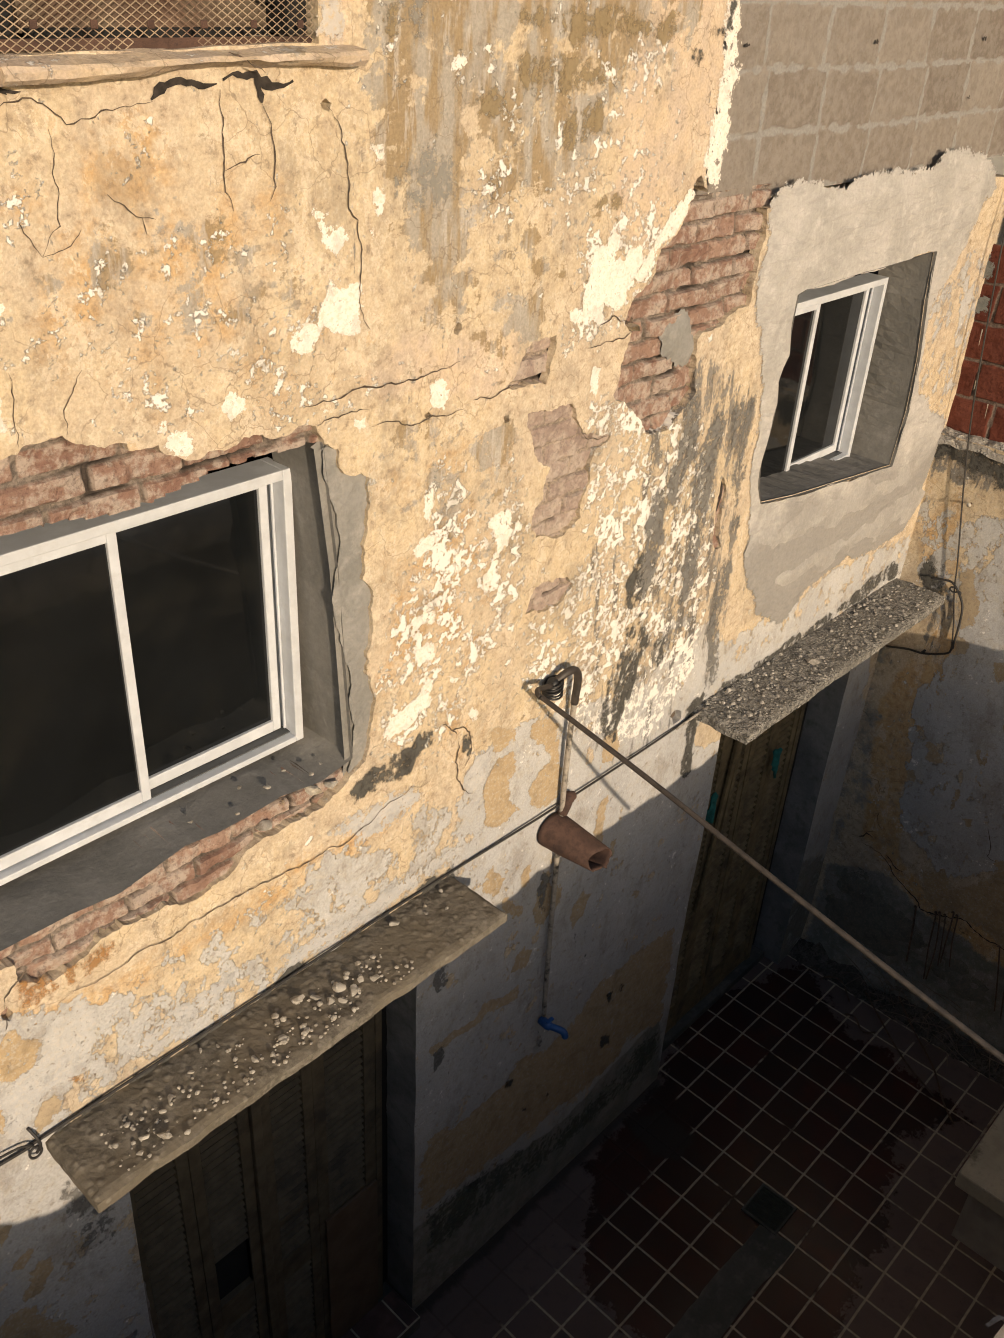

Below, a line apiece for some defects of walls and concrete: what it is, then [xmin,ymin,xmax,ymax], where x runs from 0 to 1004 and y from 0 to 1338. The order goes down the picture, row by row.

crack [0,52,294,257]
crack [329,108,368,326]
spalling [569,0,771,430]
spalling [0,403,332,536]
crack [304,361,518,427]
spalling [527,404,609,537]
water stain [934,445,1004,490]
peeling [478,504,513,591]
water stain [600,398,755,743]
spalling [0,760,343,978]
peeling [0,993,99,1140]
crack [985,1315,1004,1327]